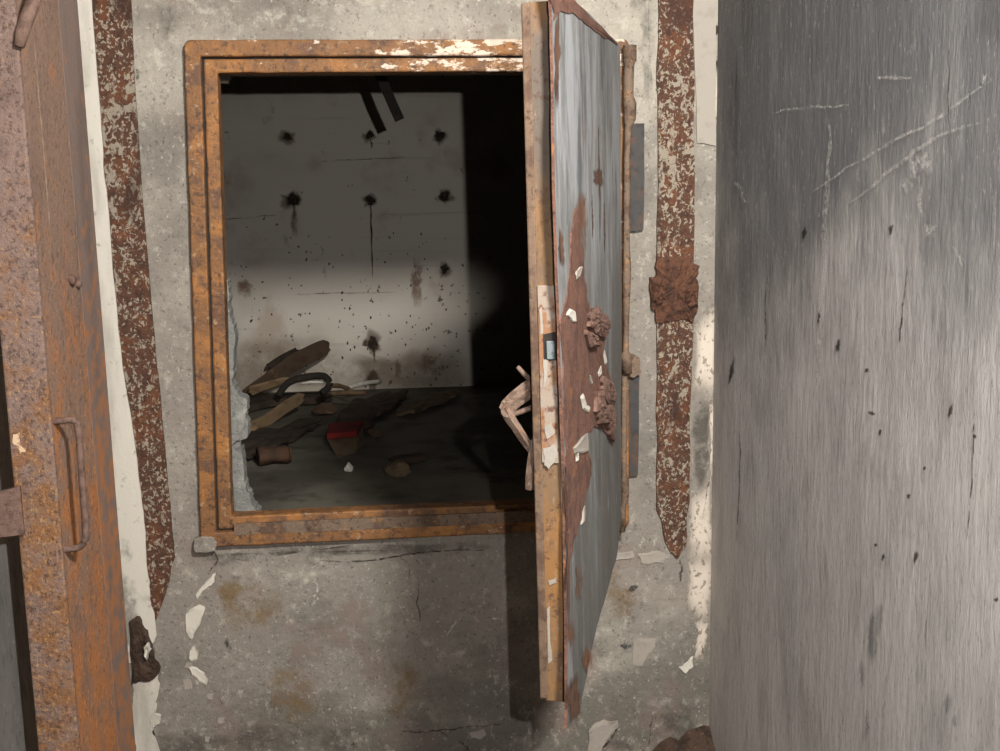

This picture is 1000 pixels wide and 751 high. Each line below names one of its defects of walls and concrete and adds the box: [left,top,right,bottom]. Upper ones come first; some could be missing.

corrosion [287,193,300,217]
corrosion [365,196,375,273]
spalling [227,278,262,511]
corrosion [368,336,379,389]
corrosion [559,129,618,614]
peeling [183,573,216,700]
corrosion [567,678,580,721]